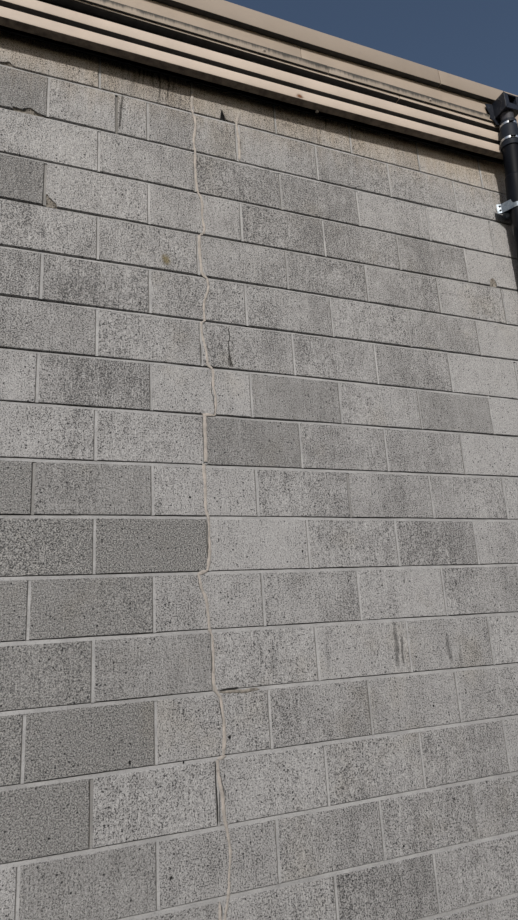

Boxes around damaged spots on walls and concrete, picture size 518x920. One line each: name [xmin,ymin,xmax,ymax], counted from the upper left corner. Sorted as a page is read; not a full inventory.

crack [190,83,233,920]
crack [234,111,242,160]